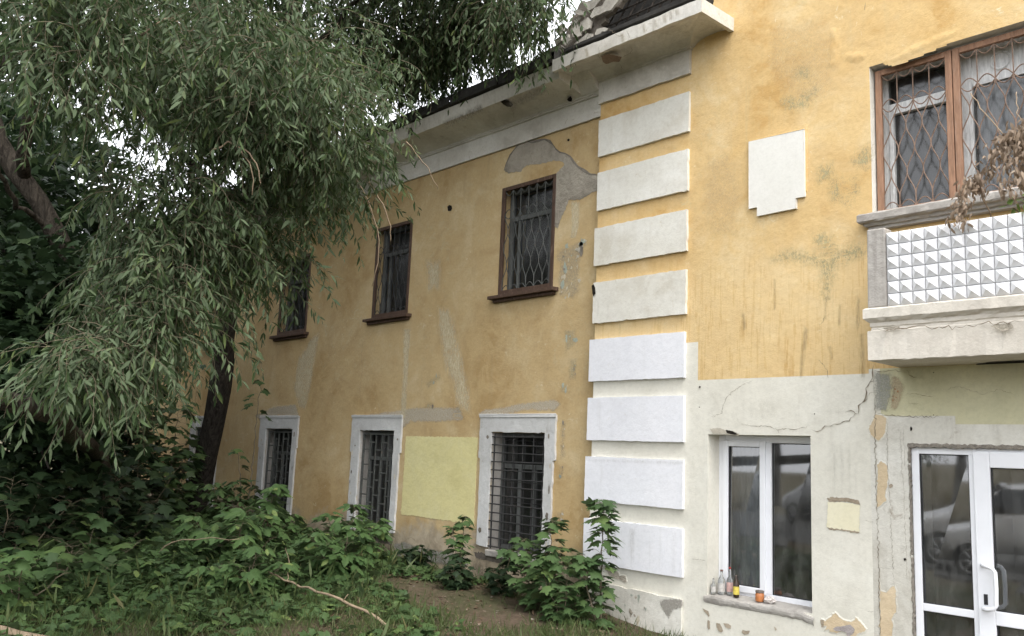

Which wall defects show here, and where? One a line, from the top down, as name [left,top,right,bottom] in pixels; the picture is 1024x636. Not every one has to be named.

spalling [504,140,597,229]
crack [869,321,1019,332]
peeling [868,377,904,442]
crack [748,368,1008,633]
peeling [875,460,890,509]
spalling [661,599,683,618]
peeling [702,608,750,635]
peeling [820,582,898,636]